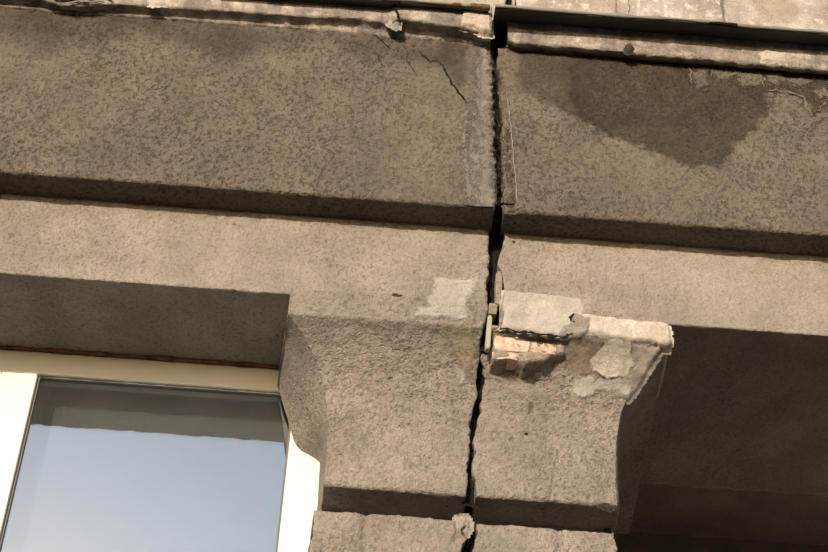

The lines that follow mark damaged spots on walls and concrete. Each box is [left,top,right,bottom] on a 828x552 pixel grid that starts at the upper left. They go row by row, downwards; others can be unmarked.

spalling [385,4,402,31]
crack [374,35,467,103]
water stain [518,53,828,167]
peeling [415,277,477,319]
crack [461,38,514,552]
spalling [486,313,674,426]
spalling [452,513,474,538]